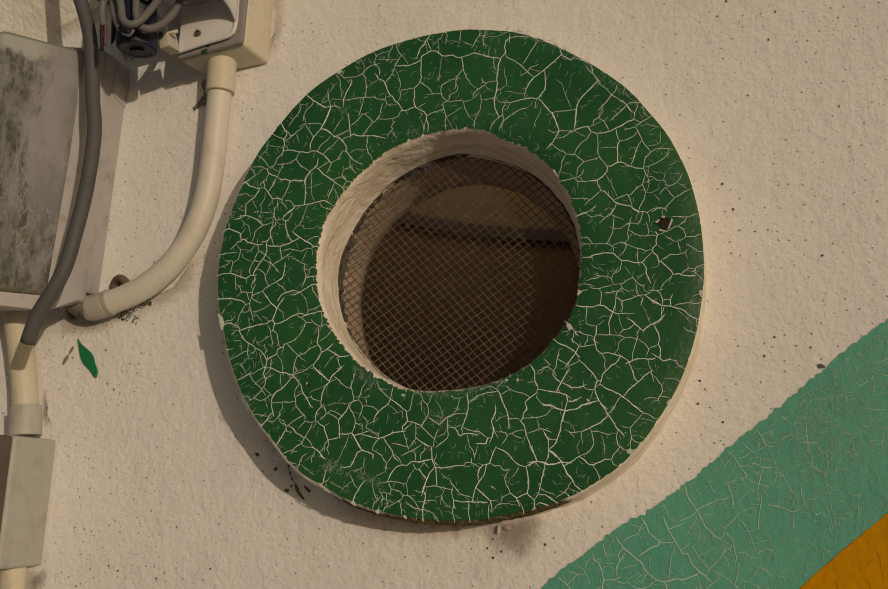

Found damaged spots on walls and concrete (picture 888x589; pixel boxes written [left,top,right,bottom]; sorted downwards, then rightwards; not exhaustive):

crack [216,26,705,522]
crack [557,325,888,589]